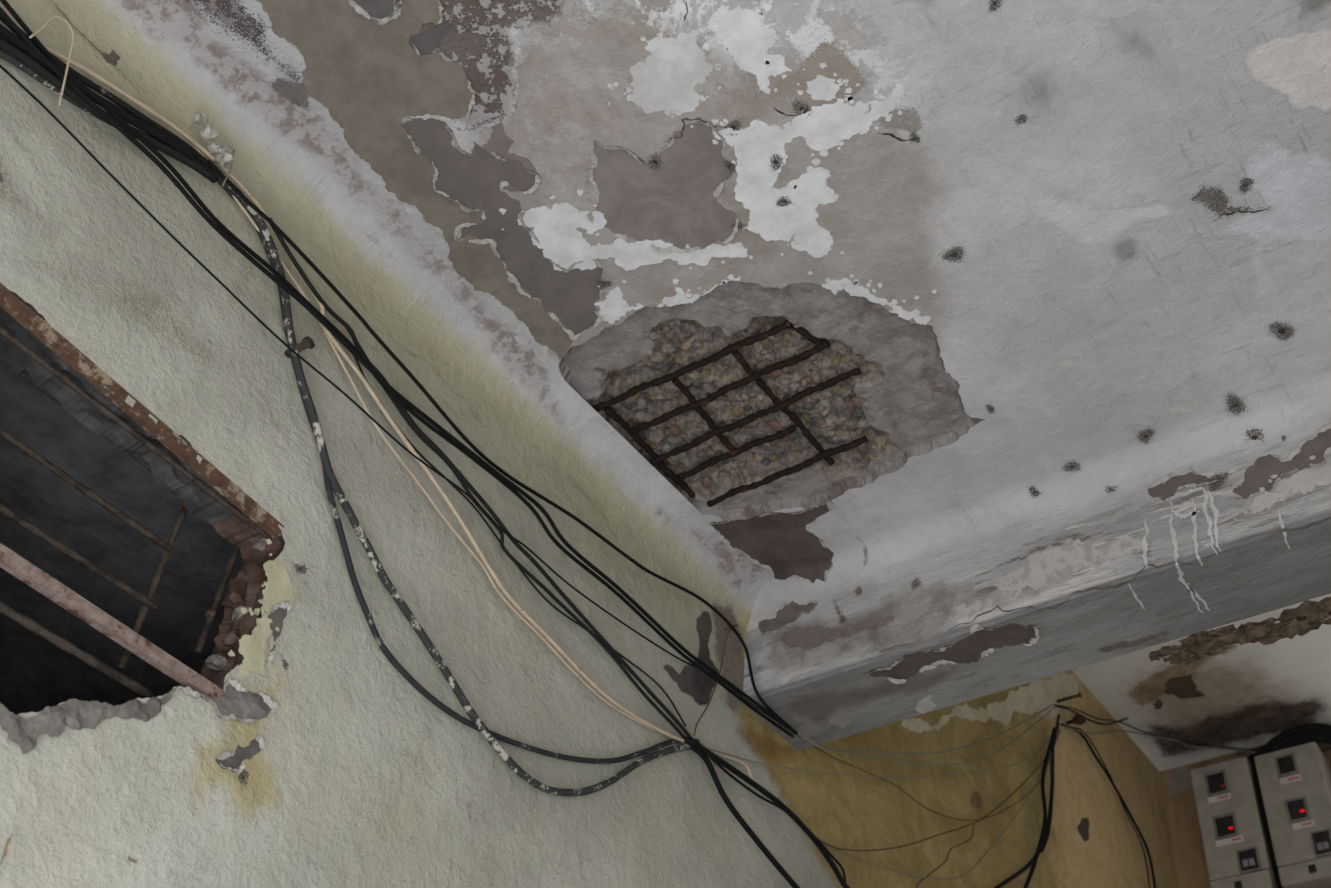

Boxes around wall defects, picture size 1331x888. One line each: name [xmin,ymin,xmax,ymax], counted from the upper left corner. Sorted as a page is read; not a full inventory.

spalling [256,0,986,583]
peeling [758,600,895,653]